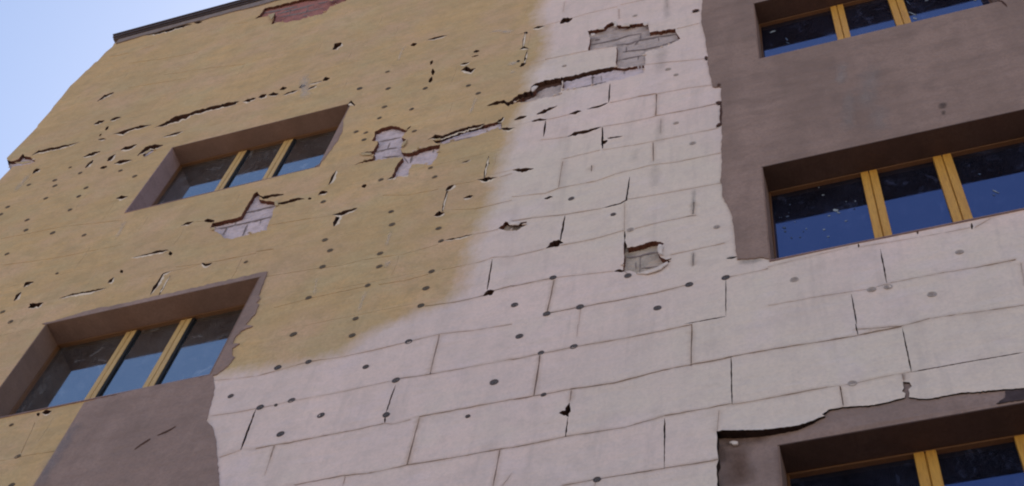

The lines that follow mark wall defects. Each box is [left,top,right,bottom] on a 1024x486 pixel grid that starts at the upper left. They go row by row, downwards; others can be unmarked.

spalling [255,0,346,24]
crack [429,17,622,147]
spalling [514,21,680,103]
crack [32,77,330,174]
spalling [355,122,501,178]
spalling [204,192,312,239]
spalling [615,231,671,275]
crack [241,410,256,449]
crack [559,403,571,437]
spalling [716,382,1024,486]